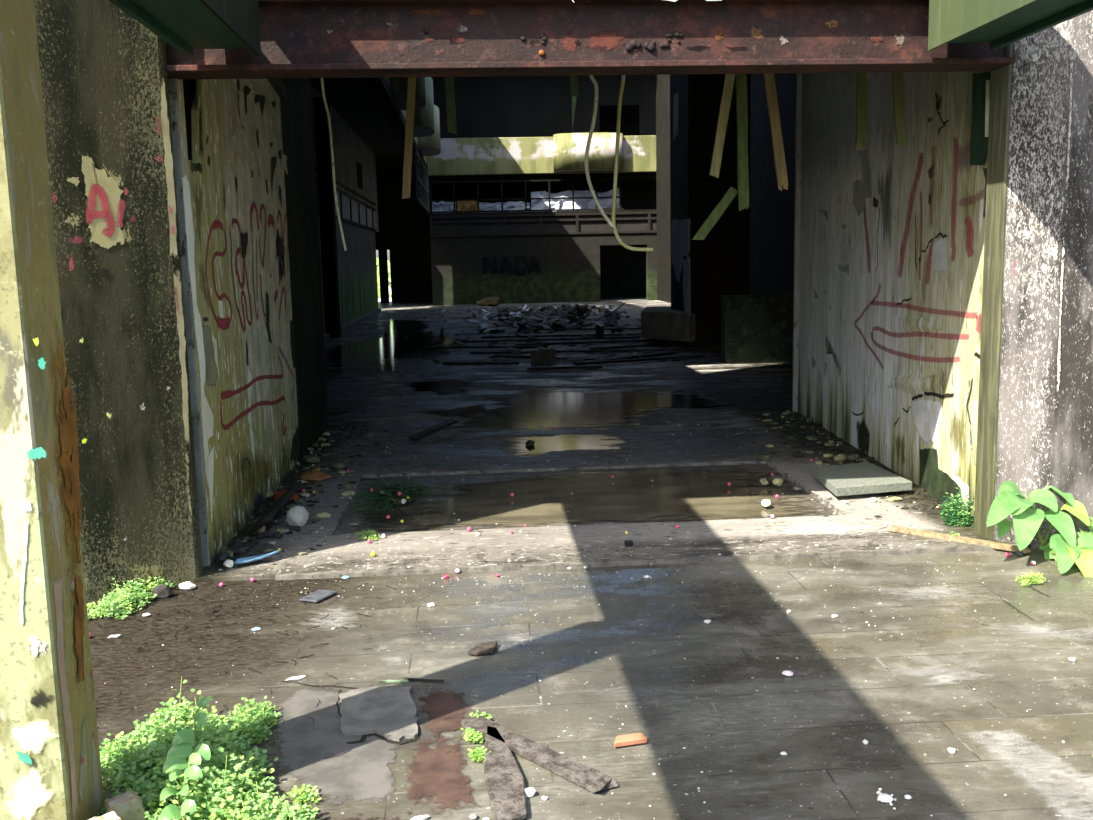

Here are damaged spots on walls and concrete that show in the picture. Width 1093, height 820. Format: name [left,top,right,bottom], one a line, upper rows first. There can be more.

corrosion [562,37,576,51]
corrosion [589,30,683,52]
peeling [65,155,132,249]
spalling [240,232,248,258]
peeling [231,79,288,208]
spalling [276,228,286,285]
peeling [837,123,878,216]
peeling [931,237,948,272]
peeling [161,79,218,532]
spalling [912,398,969,509]
corrosion [52,321,84,682]
spalling [525,787,548,800]